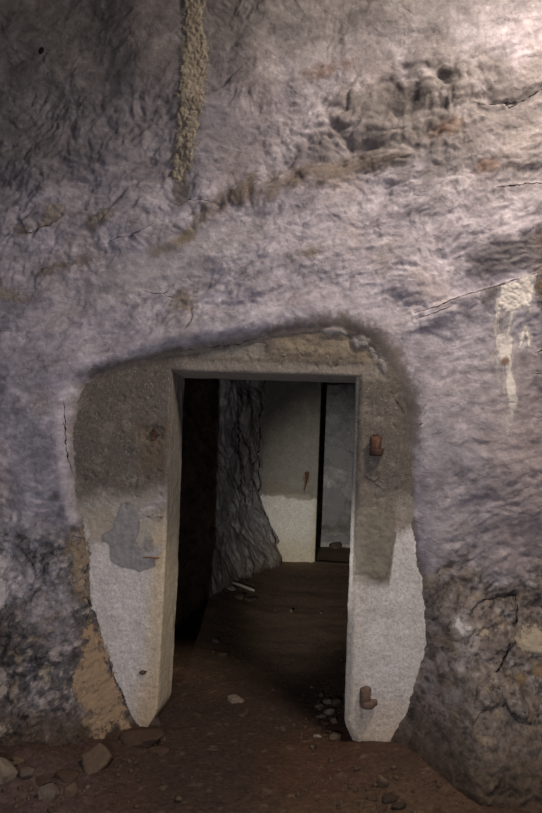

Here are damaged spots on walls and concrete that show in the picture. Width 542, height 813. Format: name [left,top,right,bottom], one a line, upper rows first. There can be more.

leakage [173,173,188,206]
crack [415,272,538,319]
leakage [482,271,542,436]
crack [480,595,518,624]
crack [496,643,511,672]